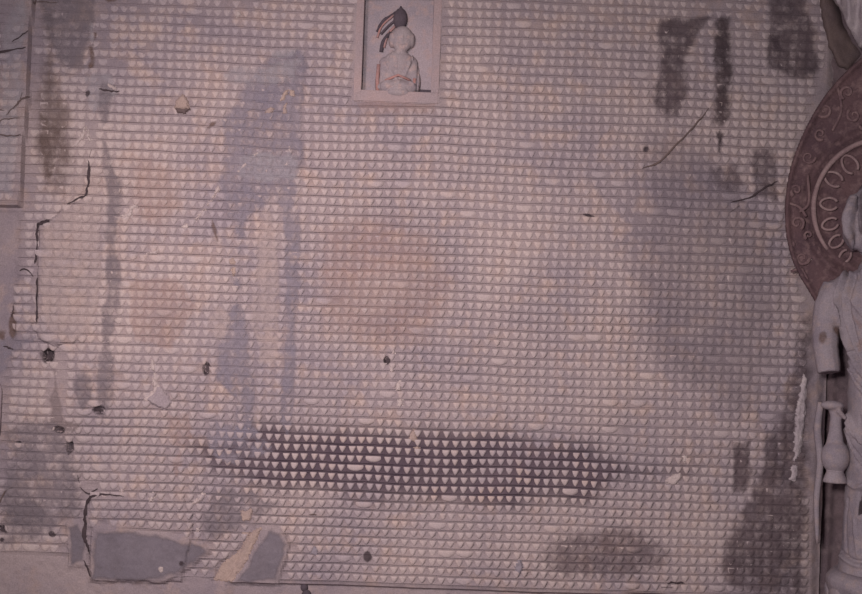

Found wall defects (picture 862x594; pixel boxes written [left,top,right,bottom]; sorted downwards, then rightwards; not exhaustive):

crack [0,30,28,53]
crack [0,94,30,137]
crack [68,131,92,204]
leakage [221,51,305,304]
crack [642,109,708,169]
crack [19,219,49,323]
crack [77,476,122,576]
spalling [213,508,262,583]